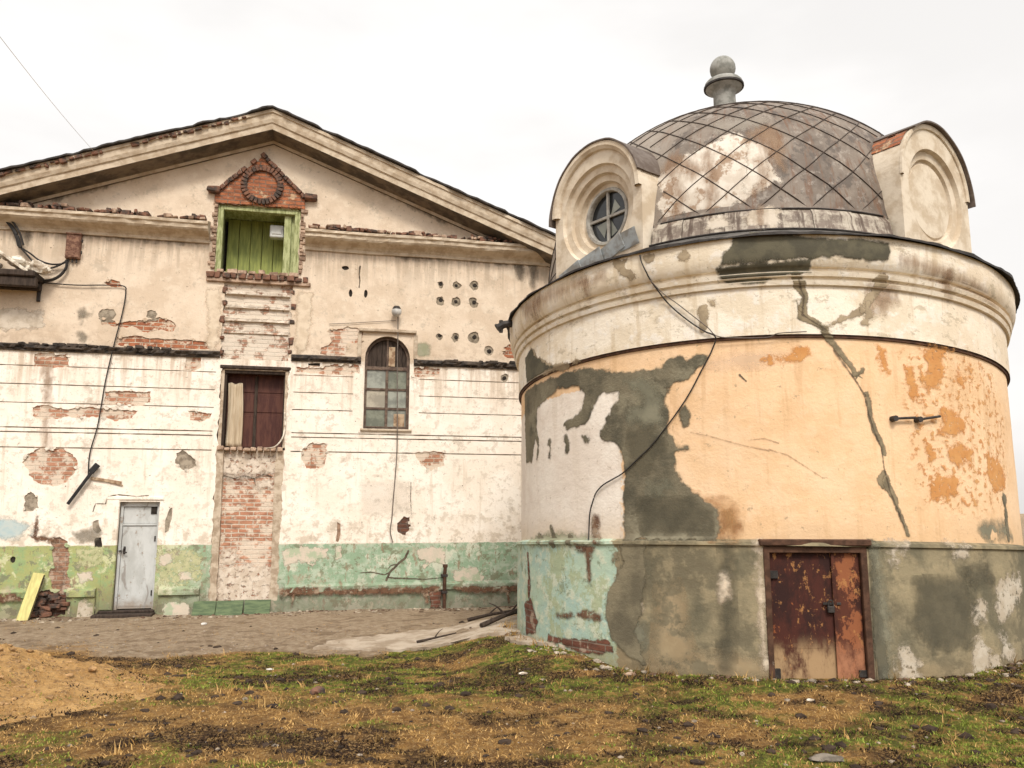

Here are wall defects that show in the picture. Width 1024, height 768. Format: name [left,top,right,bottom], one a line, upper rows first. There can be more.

flaking render [18,309,224,372]
peeling [760,347,810,365]
flaking render [23,446,78,511]
flaking render [33,389,151,421]
flaking render [300,442,329,469]
flaking render [413,450,446,472]
crack [791,271,910,537]
peeling [903,347,1005,511]
flaking render [397,517,412,535]
flaking render [30,520,103,618]
flaking render [524,552,613,655]
damp [915,578,978,650]